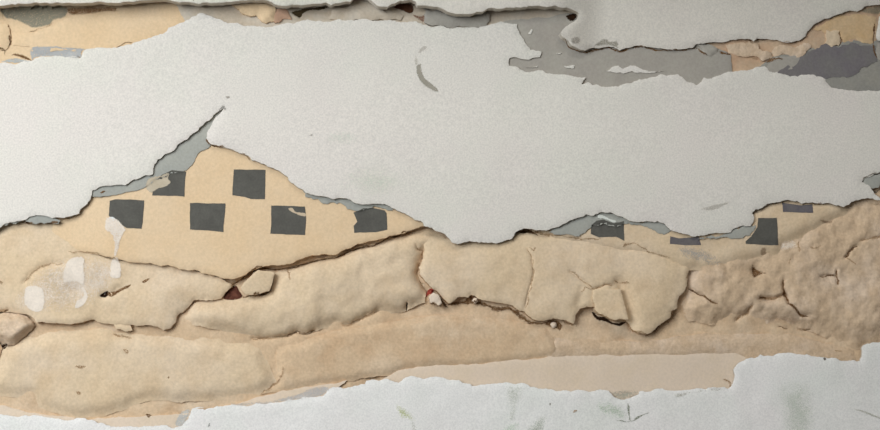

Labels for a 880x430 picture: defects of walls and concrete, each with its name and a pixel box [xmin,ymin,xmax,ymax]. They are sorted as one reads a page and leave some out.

peeling [0,0,880,91]
crack [233,230,600,326]
flaking render [0,110,880,428]
crack [592,311,677,336]
crack [736,242,819,331]
crack [820,236,879,284]